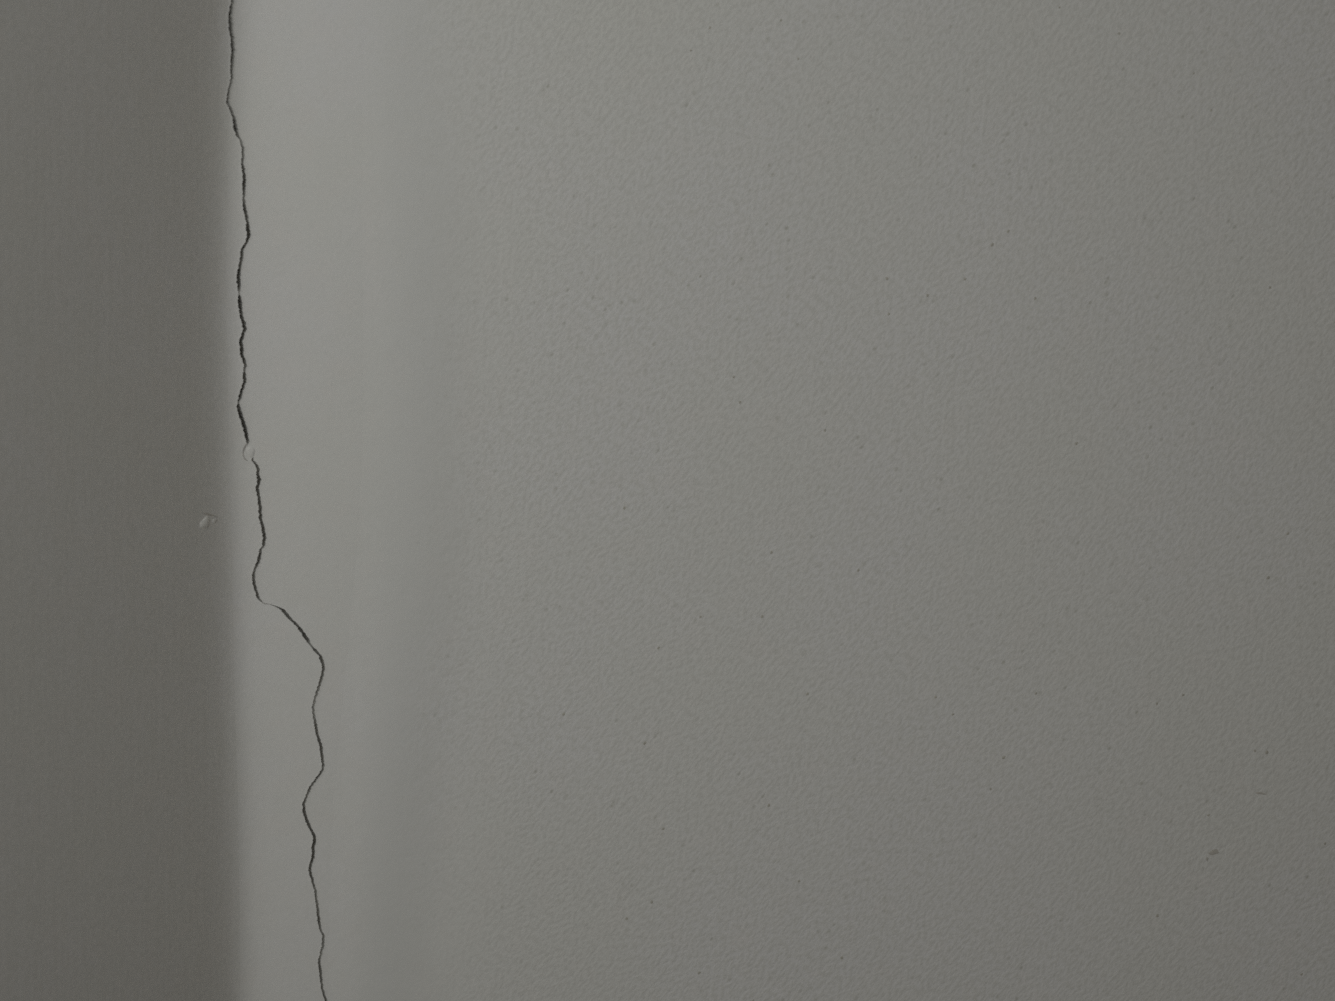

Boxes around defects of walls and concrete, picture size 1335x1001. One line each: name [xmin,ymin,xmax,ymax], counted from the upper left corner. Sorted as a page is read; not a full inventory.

crack [224,0,330,1001]